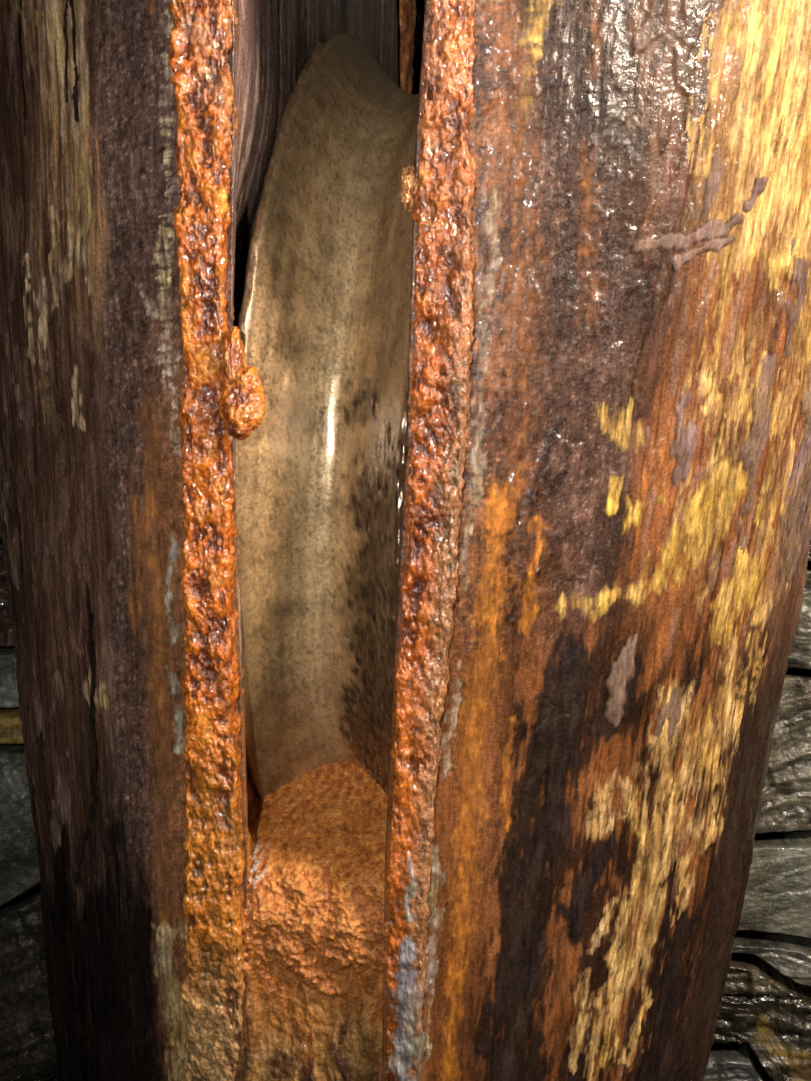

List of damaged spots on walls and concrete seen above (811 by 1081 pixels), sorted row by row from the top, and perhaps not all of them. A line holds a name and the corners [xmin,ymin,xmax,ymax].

crack [18,0,26,135]
crack [63,0,79,122]
rust [529,516,542,579]
rust [445,490,506,1079]